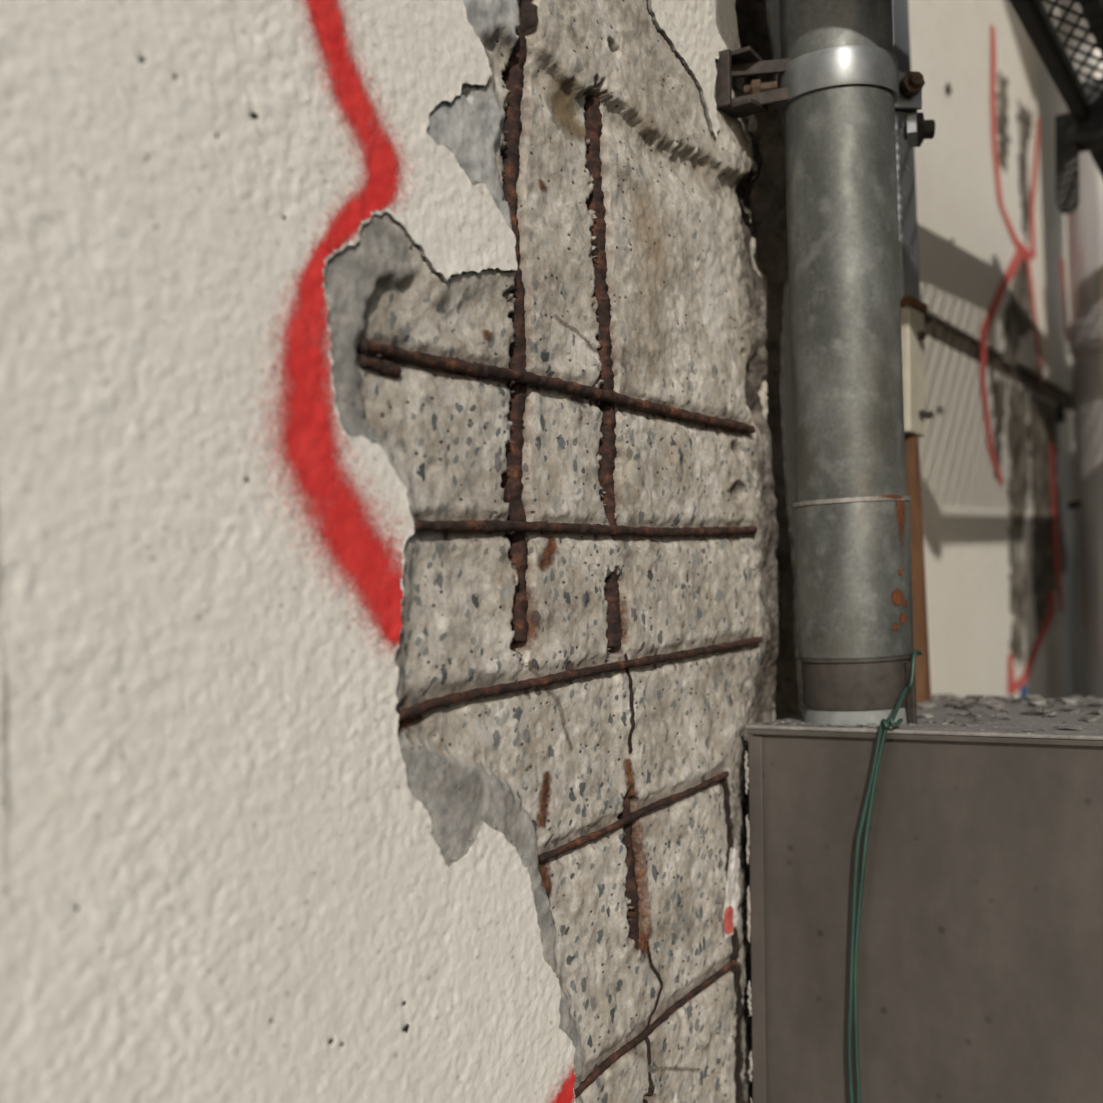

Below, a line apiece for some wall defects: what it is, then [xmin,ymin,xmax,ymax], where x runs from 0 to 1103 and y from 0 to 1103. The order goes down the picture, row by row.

rust [551,82,587,138]
rust [538,537,557,570]
spalling [324,0,782,1103]
rust [397,714,422,731]
crack [624,654,635,754]
rust [536,771,551,827]
rust [539,861,551,898]
rust [624,759,650,954]